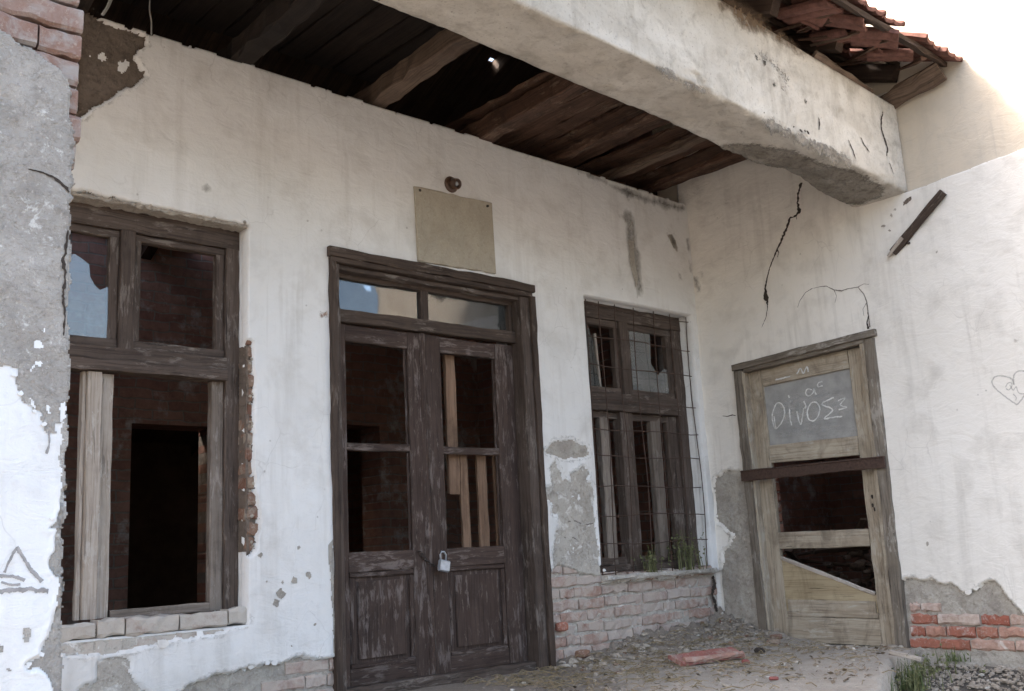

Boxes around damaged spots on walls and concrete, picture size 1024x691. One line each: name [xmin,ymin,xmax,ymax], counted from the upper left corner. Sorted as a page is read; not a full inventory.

crack [849,111,894,174]
peeling [0,13,247,454]
water stain [625,214,641,290]
crack [762,183,804,326]
crack [798,284,870,329]
spalling [238,340,263,557]
peeling [49,496,63,578]
flaking render [544,437,759,662]
flaking render [25,606,247,691]
flaking render [183,540,335,691]
flaking render [904,578,1024,670]